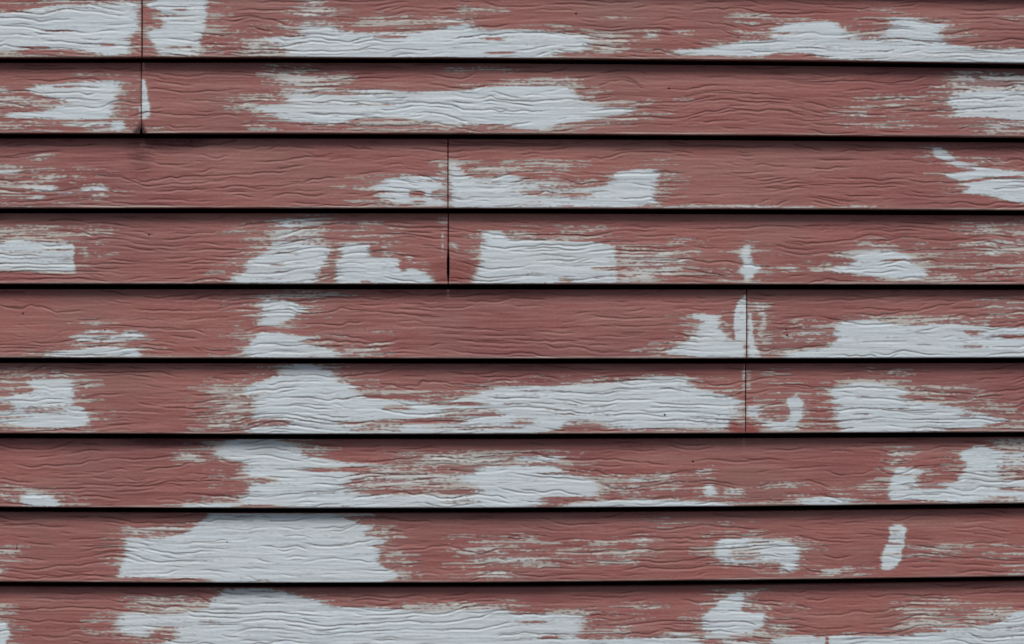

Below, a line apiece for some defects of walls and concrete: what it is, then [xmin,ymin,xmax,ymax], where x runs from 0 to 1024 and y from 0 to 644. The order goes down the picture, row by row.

peeling [0,0,671,134]
peeling [666,10,1024,134]
peeling [923,145,1024,205]
peeling [0,225,117,274]
peeling [0,322,167,433]
peeling [81,159,1024,644]